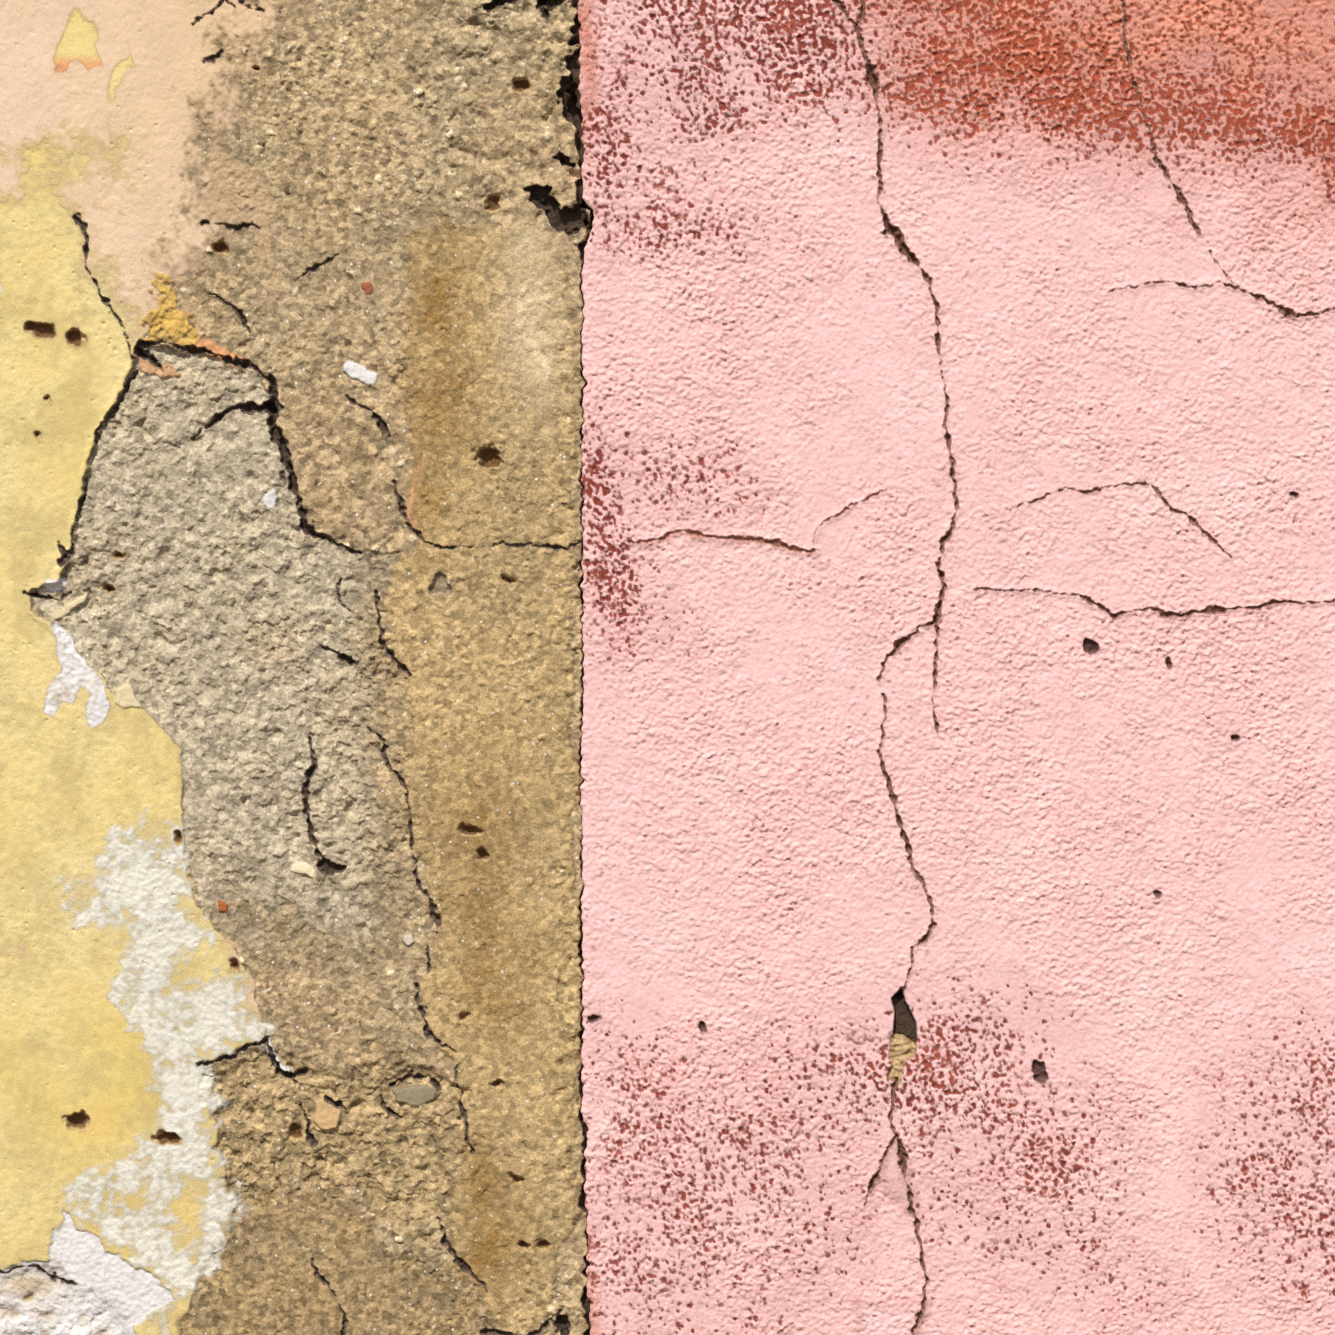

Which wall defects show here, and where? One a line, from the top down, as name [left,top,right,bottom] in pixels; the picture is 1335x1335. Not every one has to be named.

crack [22,479,87,601]
crack [72,213,412,677]
flaking render [0,0,592,1335]
crack [392,480,456,549]
crack [483,0,594,775]
crack [628,490,883,554]
crack [833,0,1335,993]
crack [480,842,591,1335]
flaking render [541,955,602,1335]
crack [864,1081,929,1335]